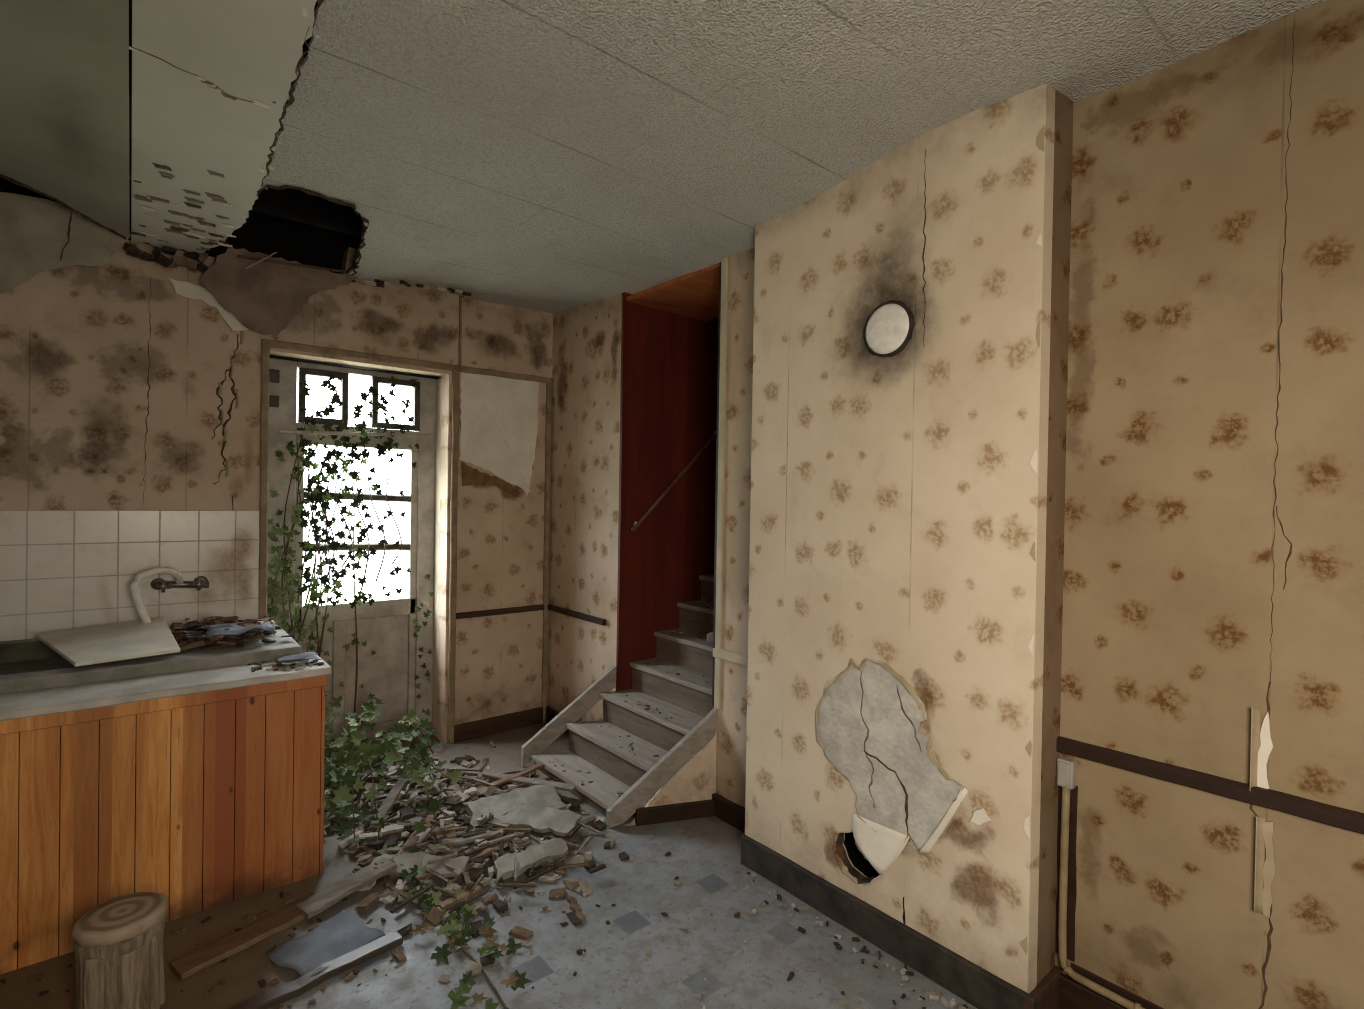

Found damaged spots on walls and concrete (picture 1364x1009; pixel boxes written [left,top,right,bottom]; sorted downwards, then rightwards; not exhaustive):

crack [129,0,324,190]
peeling [123,163,236,273]
crack [1266,21,1295,716]
flaking render [815,656,991,885]
crack [1258,904,1273,1009]